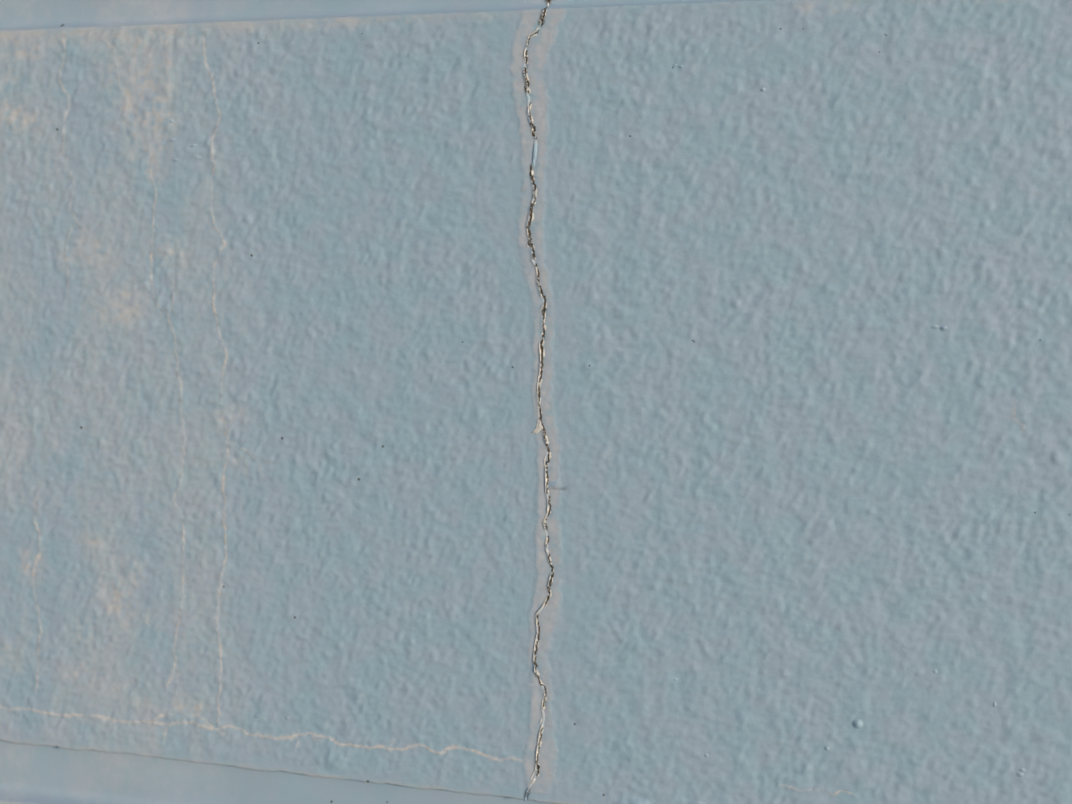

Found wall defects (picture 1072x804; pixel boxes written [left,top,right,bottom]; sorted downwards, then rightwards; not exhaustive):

crack [0,0,575,796]